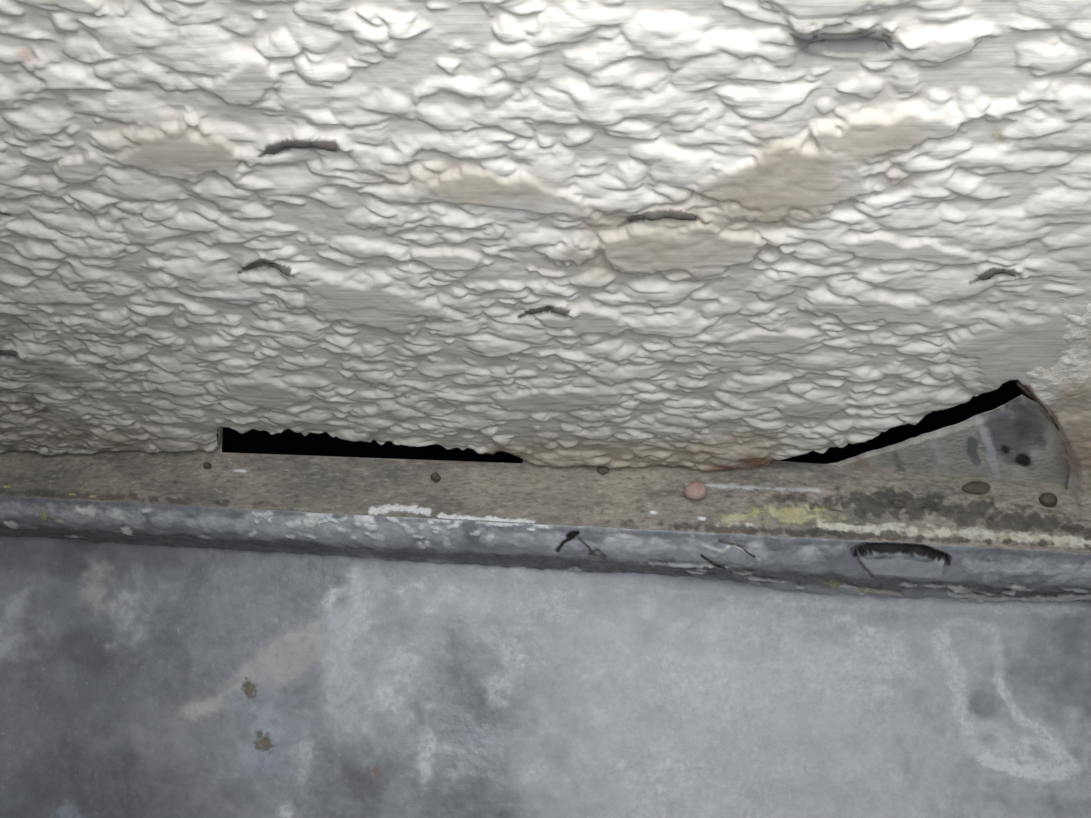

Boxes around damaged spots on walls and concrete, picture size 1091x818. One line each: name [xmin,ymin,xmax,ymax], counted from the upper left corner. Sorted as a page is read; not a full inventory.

crack [259,139,338,157]
crack [617,210,696,227]
crack [238,261,291,276]
crack [518,307,570,318]
spalling [773,380,1071,485]
hole [222,427,524,463]